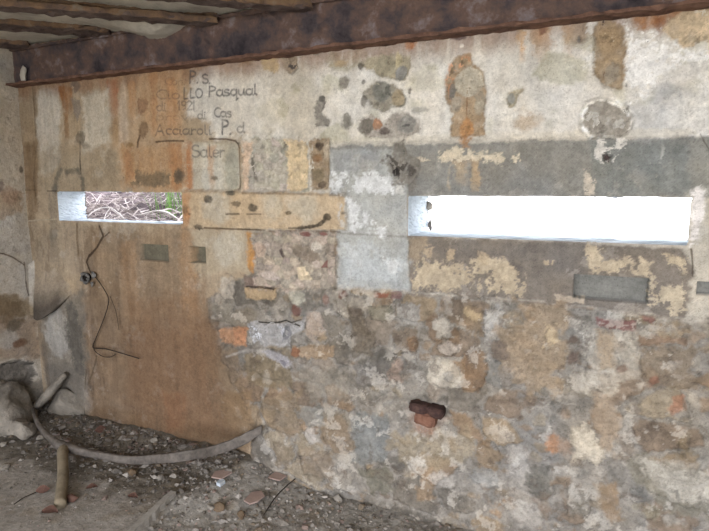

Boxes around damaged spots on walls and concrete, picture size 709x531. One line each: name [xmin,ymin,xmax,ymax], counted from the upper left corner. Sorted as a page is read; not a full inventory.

rust [513,24,580,67]
rust [628,11,680,37]
rust [56,83,75,140]
peeling [577,9,709,168]
flaking render [240,36,528,301]
peeling [582,168,599,197]
rust [105,69,246,445]
peeling [582,184,709,320]
peeling [553,292,587,306]
flaking render [218,318,307,371]
flaking render [568,419,610,468]
flaking render [638,453,709,507]